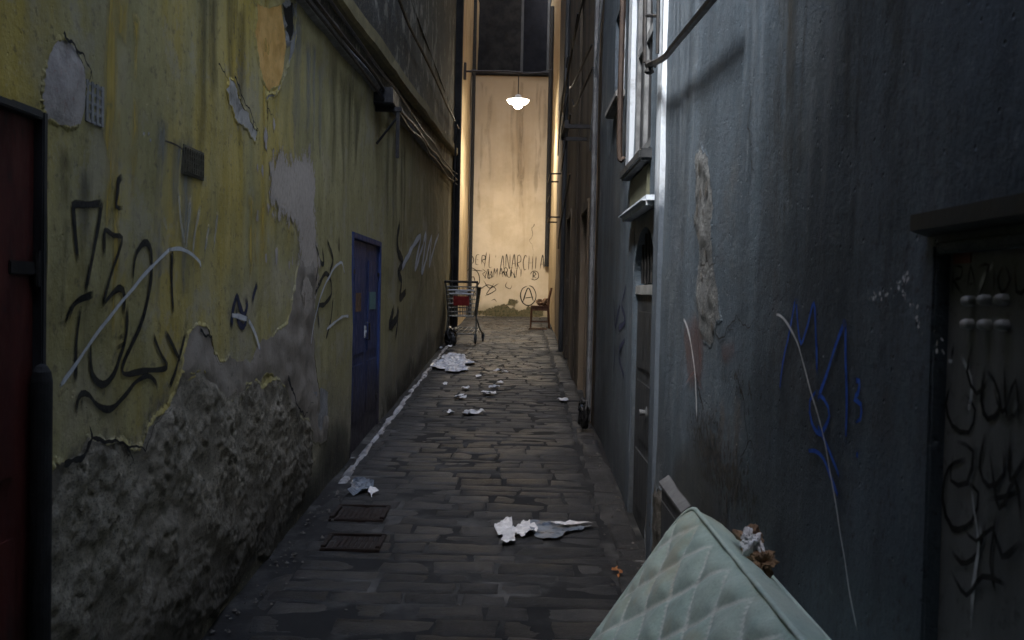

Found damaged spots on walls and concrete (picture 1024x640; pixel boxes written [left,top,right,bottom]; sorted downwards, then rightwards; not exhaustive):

peeling [40,34,88,132]
peeling [254,0,297,103]
flaking render [693,142,722,349]
flaking render [51,76,329,640]